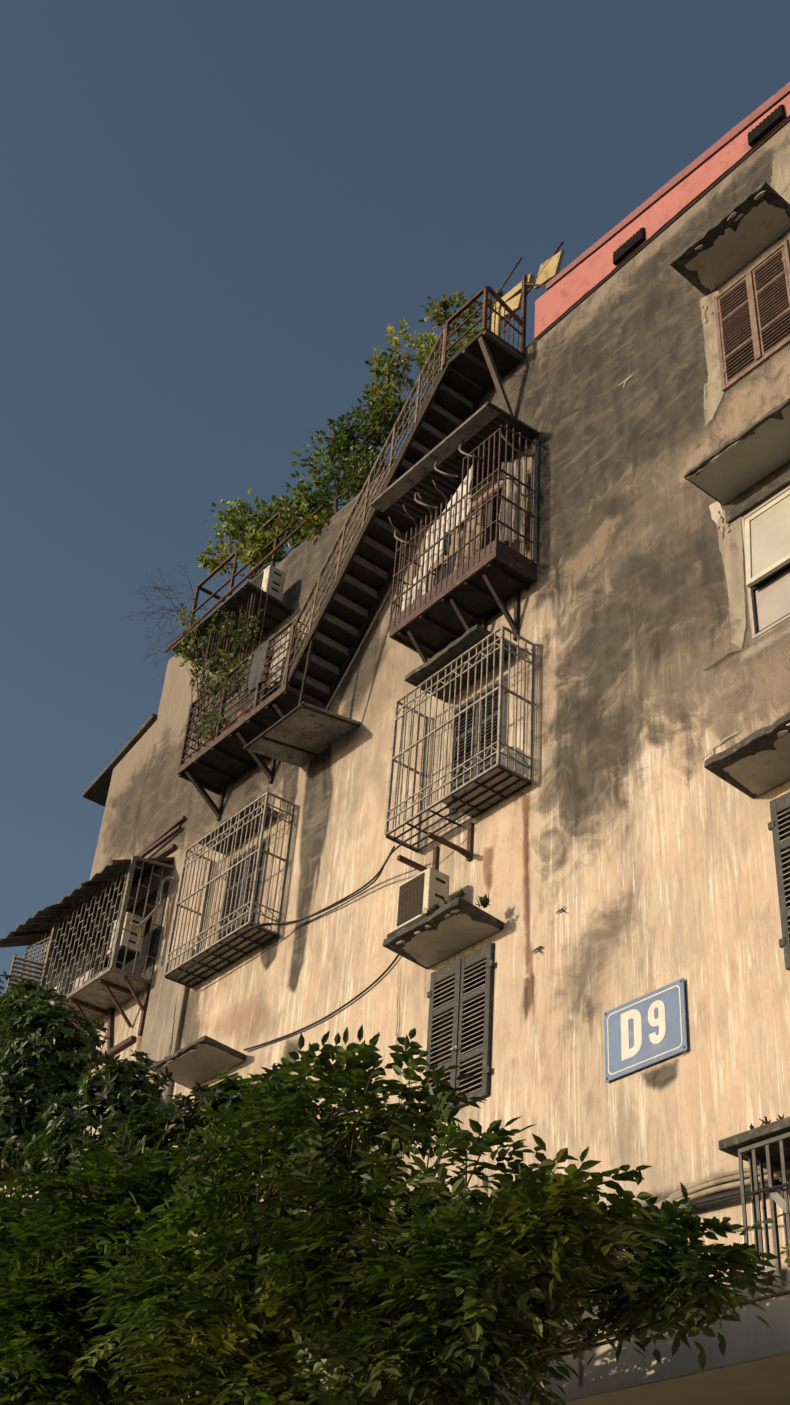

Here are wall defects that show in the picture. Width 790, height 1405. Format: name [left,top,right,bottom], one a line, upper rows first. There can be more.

flaking render [671,130,790,658]
water stain [108,628,332,991]
water stain [554,535,725,819]
flaking render [723,723,790,796]